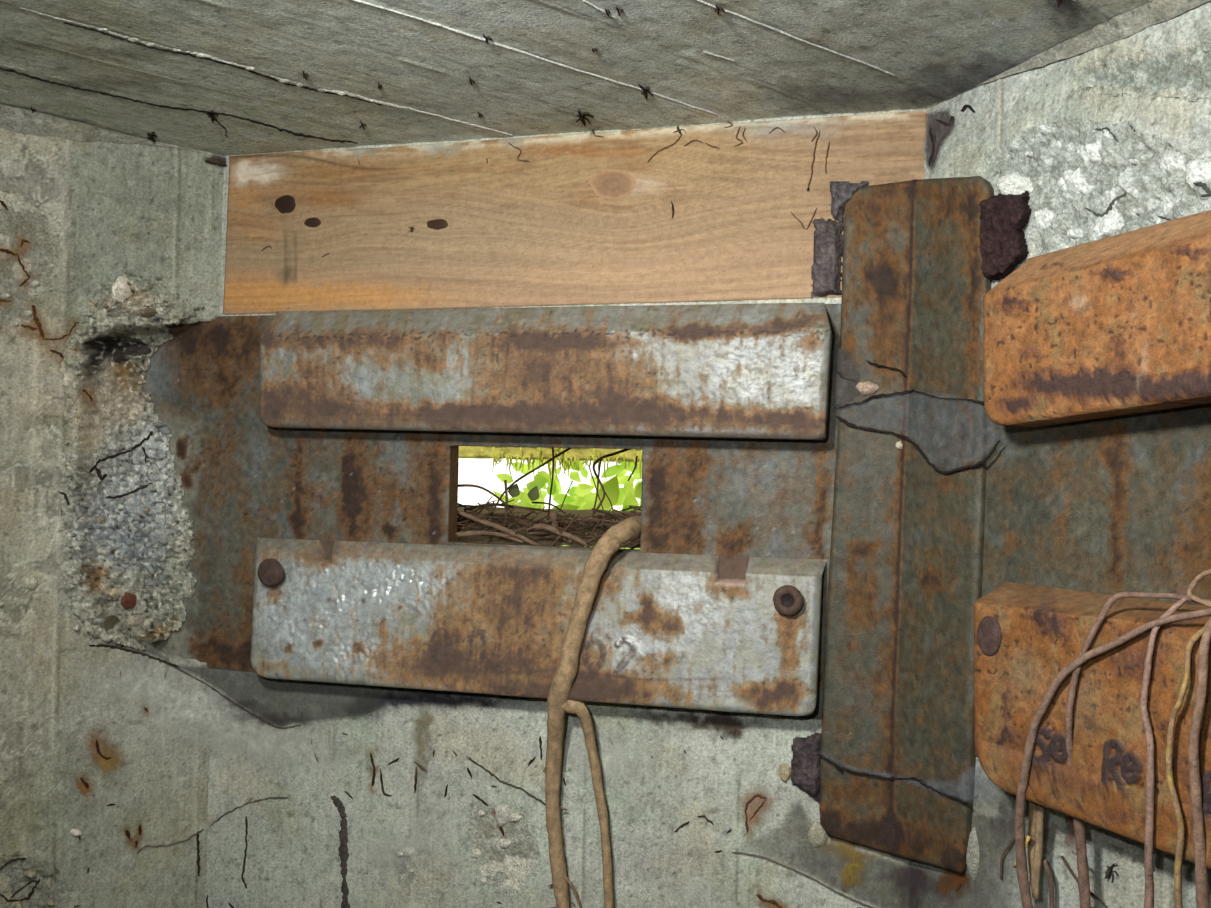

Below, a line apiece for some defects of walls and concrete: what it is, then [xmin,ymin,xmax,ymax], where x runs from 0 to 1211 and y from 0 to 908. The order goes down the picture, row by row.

crack [0,67,358,144]
crack [64,22,382,106]
spalling [52,267,203,651]
spalling [0,854,75,908]
crack [136,796,289,888]